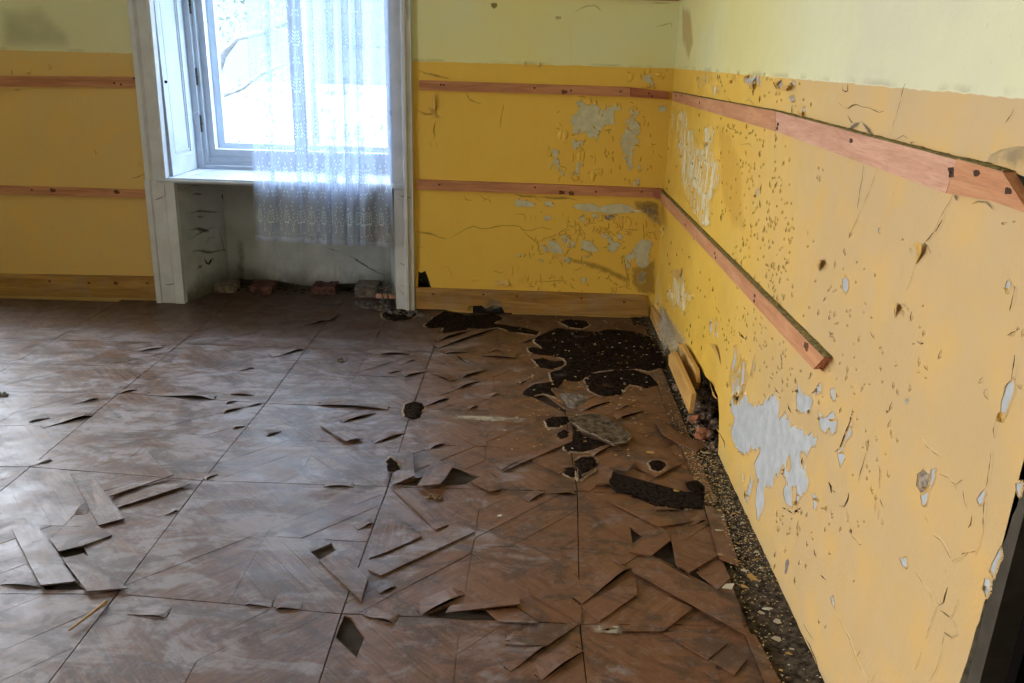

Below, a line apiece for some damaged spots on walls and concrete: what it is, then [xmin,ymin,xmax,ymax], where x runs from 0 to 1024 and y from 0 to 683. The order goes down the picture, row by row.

peeling [514,197,555,221]
peeling [549,100,643,187]
peeling [657,105,720,229]
crack [427,212,658,294]
peeling [539,203,694,316]
peeling [707,318,853,522]
peeling [996,377,1016,423]
flaking render [916,467,937,507]